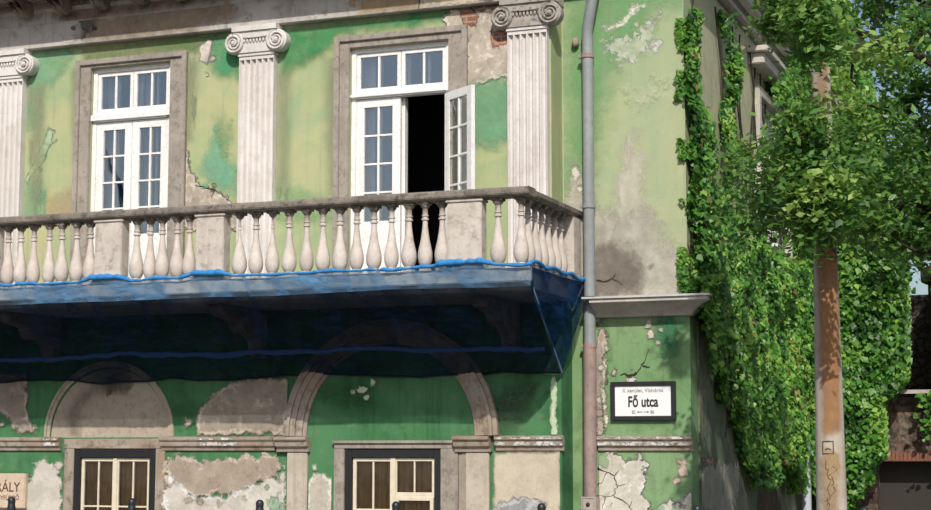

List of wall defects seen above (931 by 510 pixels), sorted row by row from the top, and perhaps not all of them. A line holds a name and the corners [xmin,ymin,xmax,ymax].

flaking render [443,4,507,85]
peeling [598,3,663,67]
leakage [614,136,647,226]
crack [620,349,649,380]
corrosion [818,245,840,434]
flaking render [0,376,36,433]
flaking render [184,378,287,446]
flaking render [596,318,741,510]
flaking render [0,459,63,510]
flaking render [161,452,286,510]
flaking render [493,437,562,510]
crack [597,467,652,510]